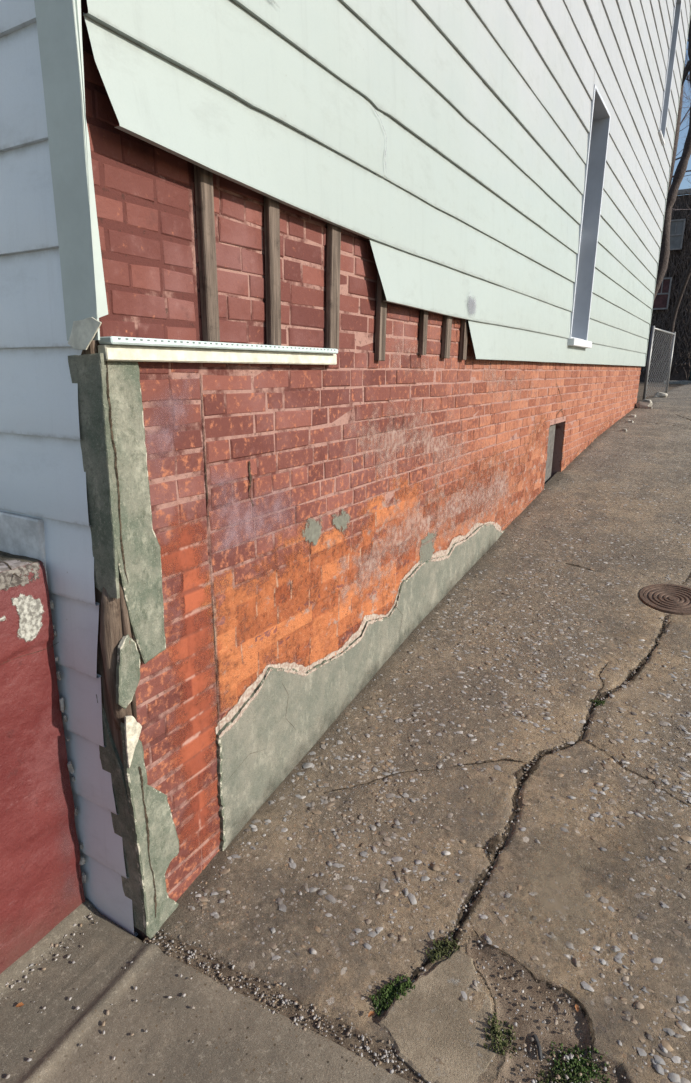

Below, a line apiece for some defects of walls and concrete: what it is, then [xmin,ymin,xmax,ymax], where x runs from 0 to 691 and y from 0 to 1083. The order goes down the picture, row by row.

spalling [0,559,44,642]
peeling [68,353,549,939]
crack [323,618,691,1017]
peeling [561,417,615,471]